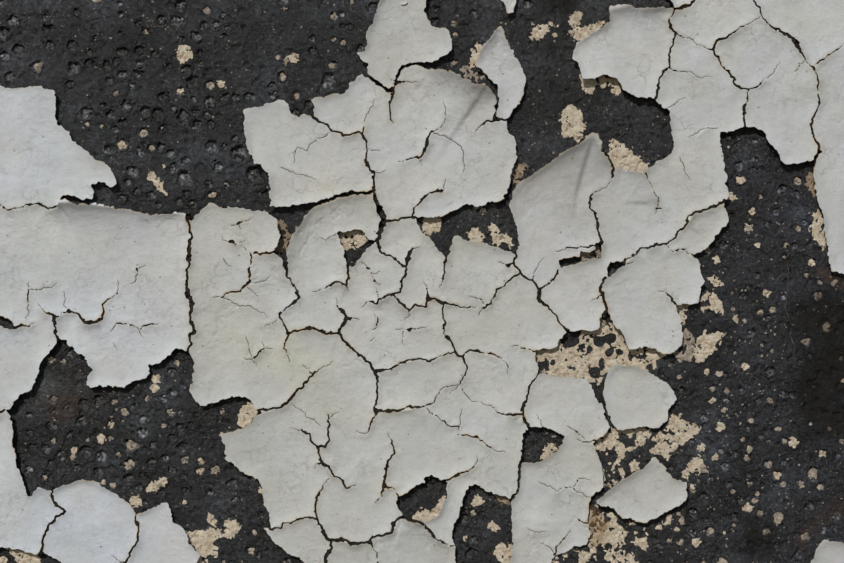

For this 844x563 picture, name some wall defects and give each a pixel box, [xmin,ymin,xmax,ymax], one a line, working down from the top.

spalling [63,44,162,156]
crack [0,202,57,211]
crack [621,199,725,265]
crack [13,264,157,349]
crack [185,213,196,352]
crack [214,80,615,563]
crack [38,485,66,563]
crack [112,512,140,563]